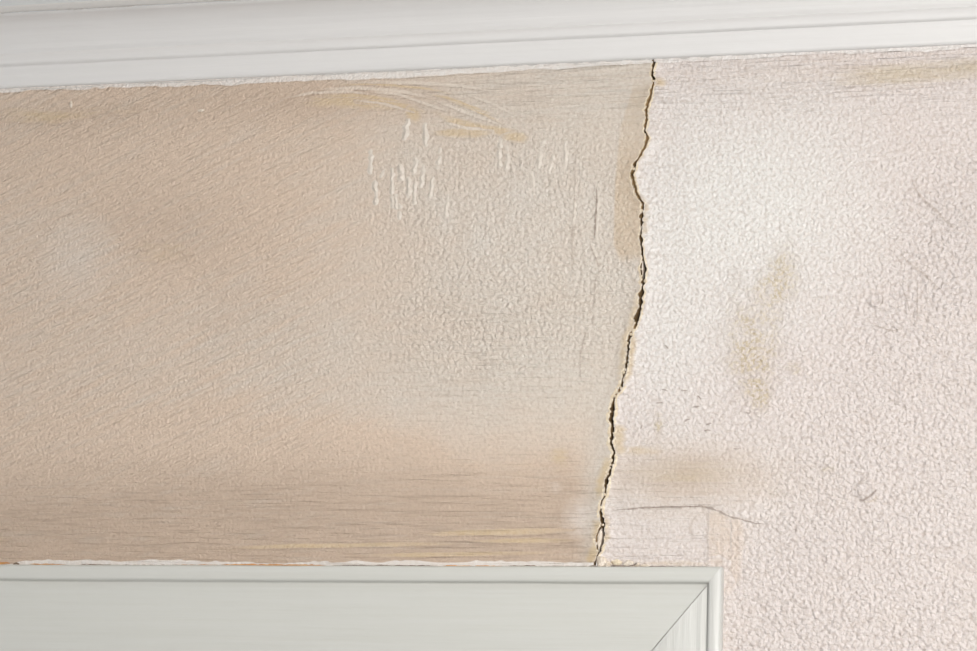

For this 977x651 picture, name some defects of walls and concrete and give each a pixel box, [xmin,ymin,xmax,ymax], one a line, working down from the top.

crack [303,54,771,565]